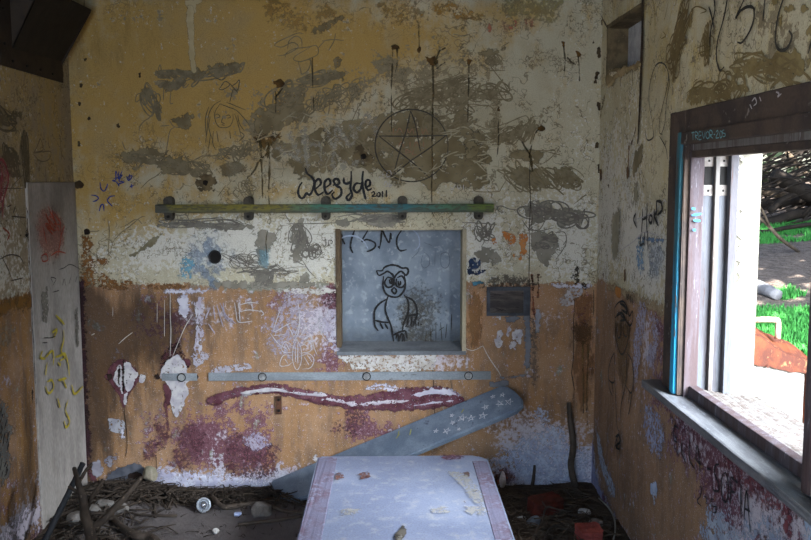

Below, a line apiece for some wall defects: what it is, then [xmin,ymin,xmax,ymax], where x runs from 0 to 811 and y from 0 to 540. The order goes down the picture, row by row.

peeling [772,0,809,29]
peeling [271,97,510,191]
rust [391,44,400,131]
rust [417,25,446,202]
peeling [474,148,582,267]
spalling [88,218,437,482]
peeling [607,282,664,383]
peeling [0,500,43,540]
damp [490,407,617,519]
peeling [640,404,692,462]
peeling [699,454,811,540]